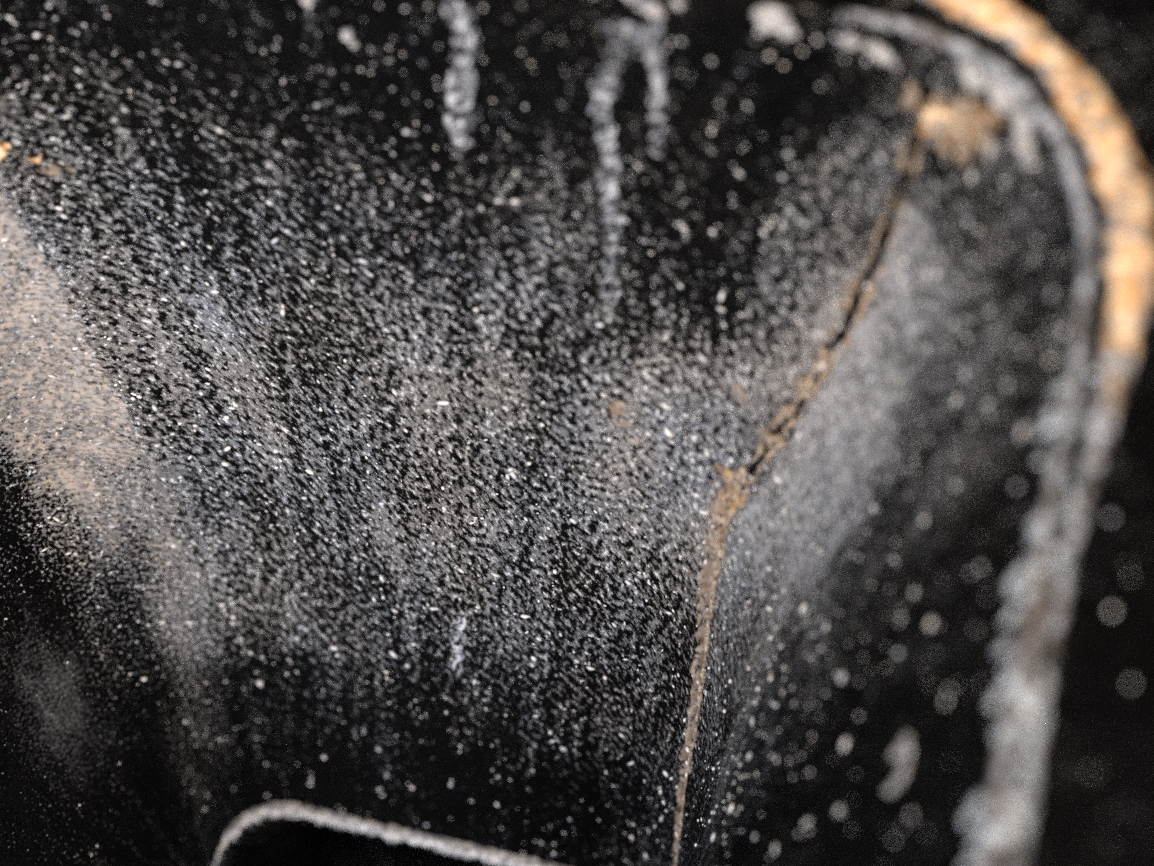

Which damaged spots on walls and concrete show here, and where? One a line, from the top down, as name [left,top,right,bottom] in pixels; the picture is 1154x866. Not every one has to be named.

leakage [440,0,480,159]
leakage [570,19,666,338]
crack [731,82,941,509]
rust [939,0,1154,412]